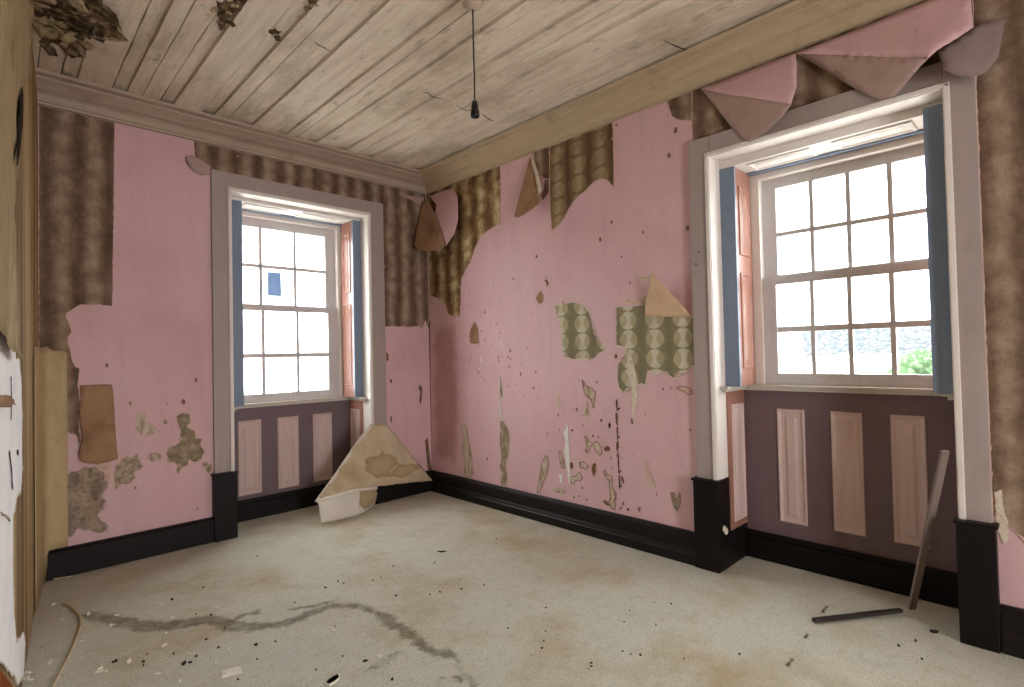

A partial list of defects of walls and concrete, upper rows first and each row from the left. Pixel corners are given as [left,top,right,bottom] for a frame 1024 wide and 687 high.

peeling [32,0,129,58]
peeling [210,0,247,31]
peeling [268,28,282,41]
peeling [655,0,928,141]
peeling [918,49,941,69]
peeling [532,122,618,231]
peeling [38,105,115,461]
peeling [193,141,501,330]
peeling [964,0,1024,541]
peeling [555,302,694,393]
peeling [0,330,26,686]
leakage [68,467,107,536]